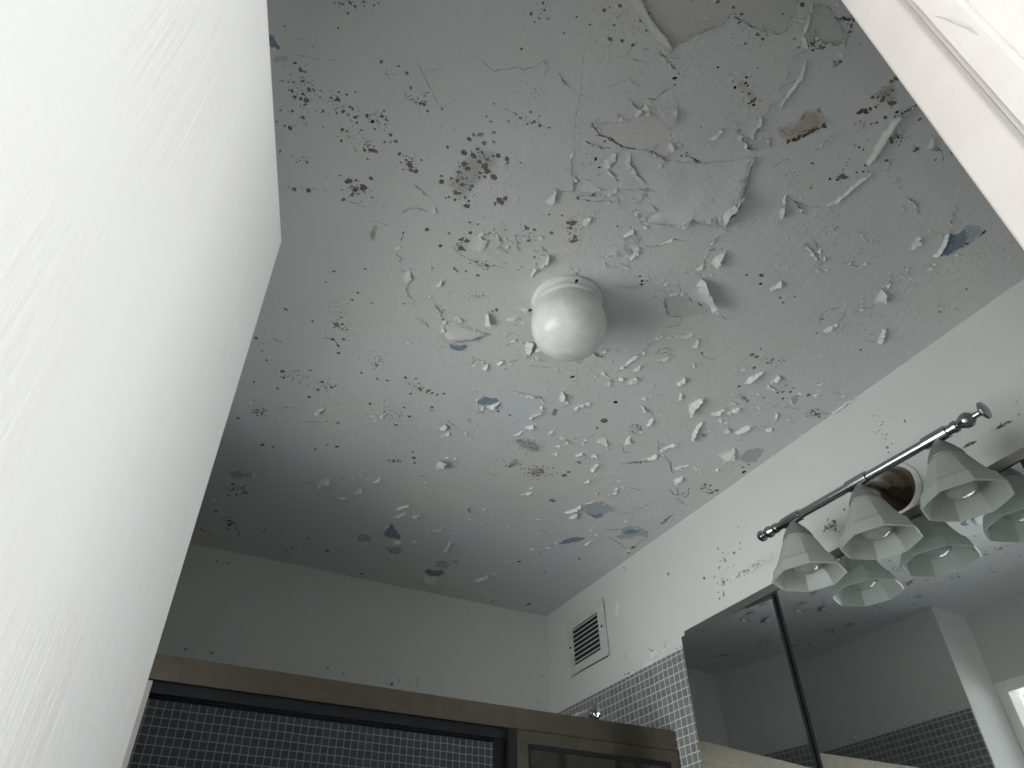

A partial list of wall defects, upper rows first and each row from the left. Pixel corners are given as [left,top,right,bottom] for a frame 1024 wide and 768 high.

crack [479,29,680,114]
leakage [324,175,373,207]
leakage [276,62,422,174]
leakage [439,115,521,208]
leakage [548,213,581,244]
rust [779,117,827,144]
flaking render [908,209,991,258]
flaking render [416,88,853,573]
peeling [820,274,904,351]
leakage [495,442,570,480]
flaking render [325,499,510,593]